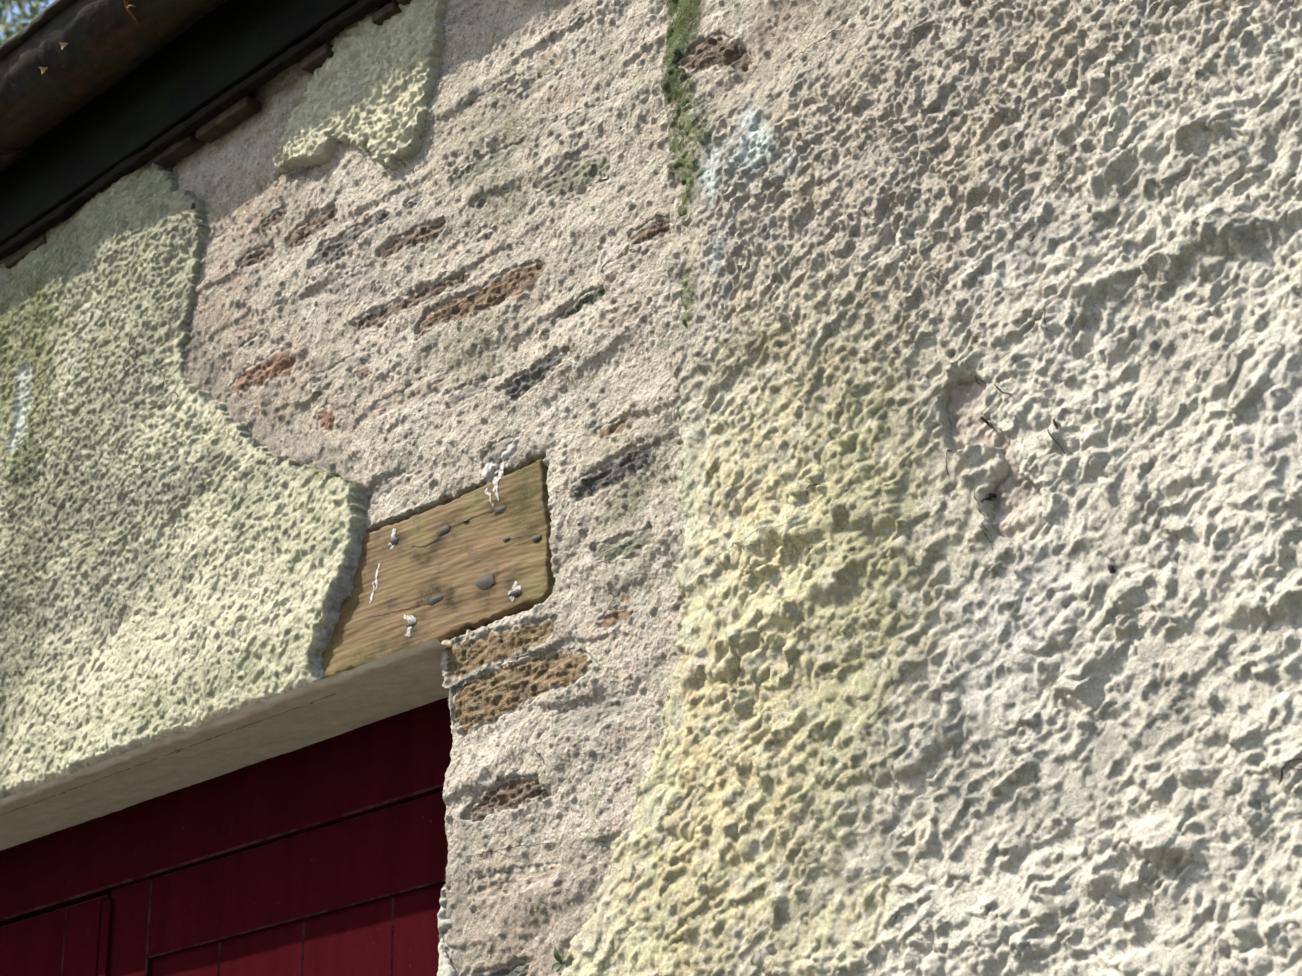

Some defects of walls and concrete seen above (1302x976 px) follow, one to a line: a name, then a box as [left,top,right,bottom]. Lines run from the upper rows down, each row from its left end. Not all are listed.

damp [662,0,704,211]
spalling [171,0,891,976]
spalling [946,380,1046,542]